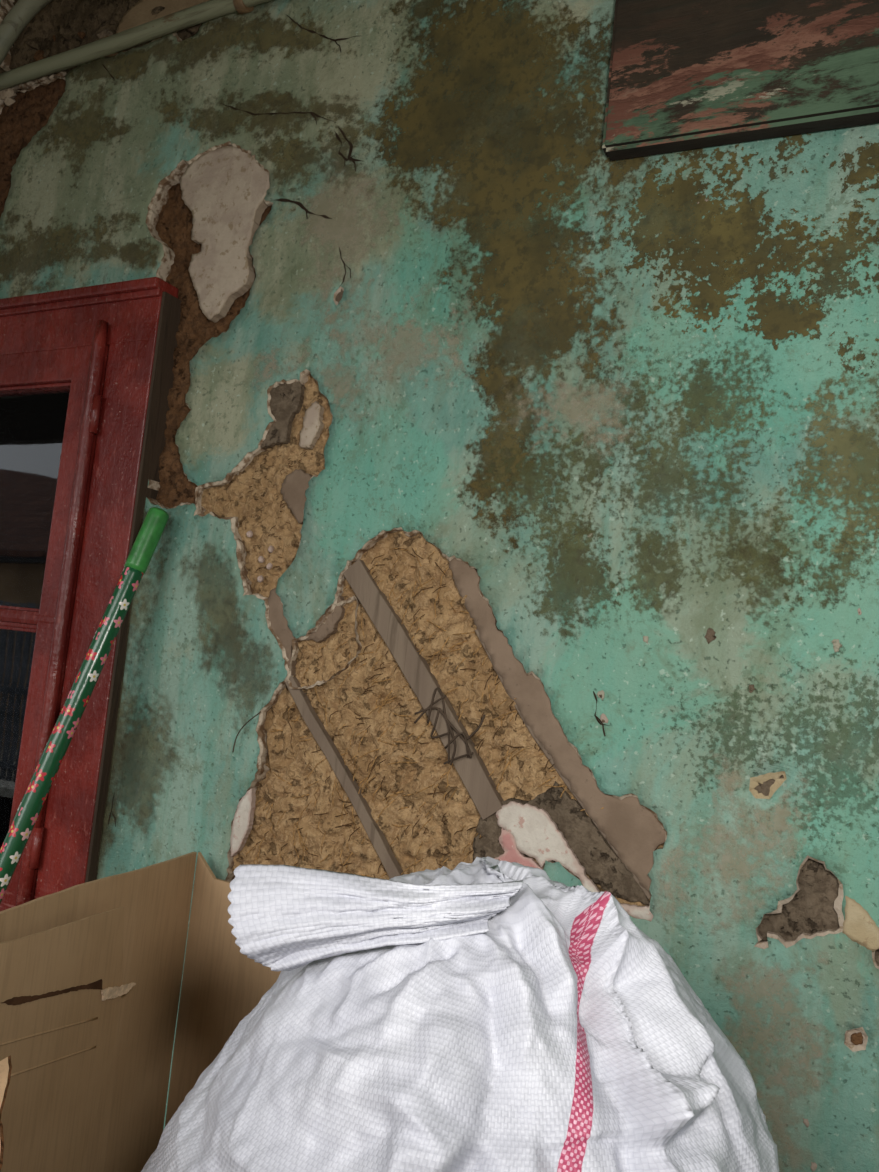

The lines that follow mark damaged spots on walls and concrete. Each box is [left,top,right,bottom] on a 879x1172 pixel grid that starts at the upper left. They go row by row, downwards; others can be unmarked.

flaking render [0,0,209,74]
flaking render [0,66,78,218]
leakage [371,0,879,645]
flaking render [146,141,667,921]
flaking render [749,771,786,799]
flaking render [755,855,879,969]
flaking render [844,1027,868,1052]